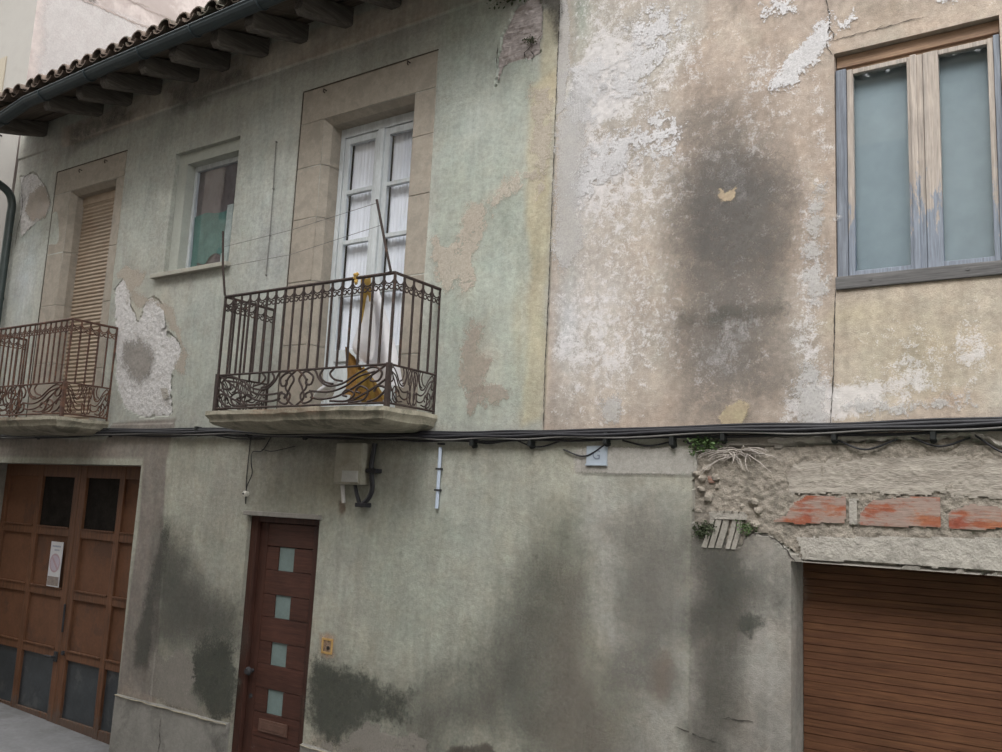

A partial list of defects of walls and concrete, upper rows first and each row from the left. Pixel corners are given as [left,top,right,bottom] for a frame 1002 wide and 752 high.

spalling [498,0,543,81]
peeling [765,7,858,95]
crack [826,0,923,54]
spalling [20,173,51,237]
leakage [689,131,784,389]
spalling [115,265,189,417]
peeling [718,399,749,424]
peeling [786,362,979,423]
spalling [575,436,1002,575]
leakage [135,531,240,721]
leakage [304,657,406,746]
leakage [448,743,494,752]